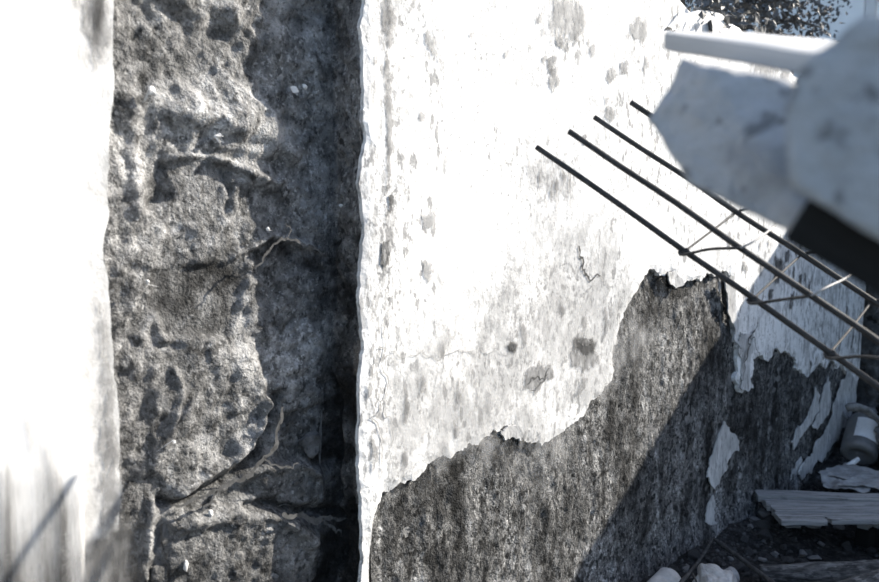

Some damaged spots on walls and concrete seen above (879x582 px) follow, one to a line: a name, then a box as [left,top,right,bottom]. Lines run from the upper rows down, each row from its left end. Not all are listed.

peeling [374,0,396,214]
peeling [381,240,390,268]
peeling [423,212,436,233]
peeling [759,234,811,309]
spalling [370,269,857,582]